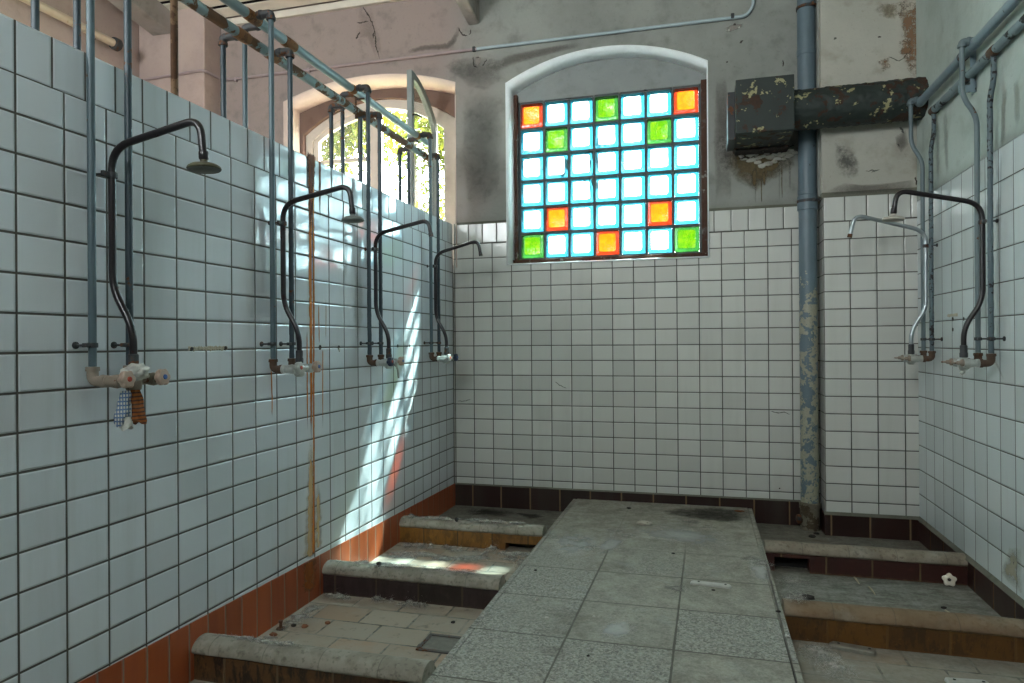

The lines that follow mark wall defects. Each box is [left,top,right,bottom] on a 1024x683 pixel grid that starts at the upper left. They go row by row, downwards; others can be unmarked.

crack [356,7,380,59]
water stain [730,151,791,202]
corrosion [304,153,323,591]